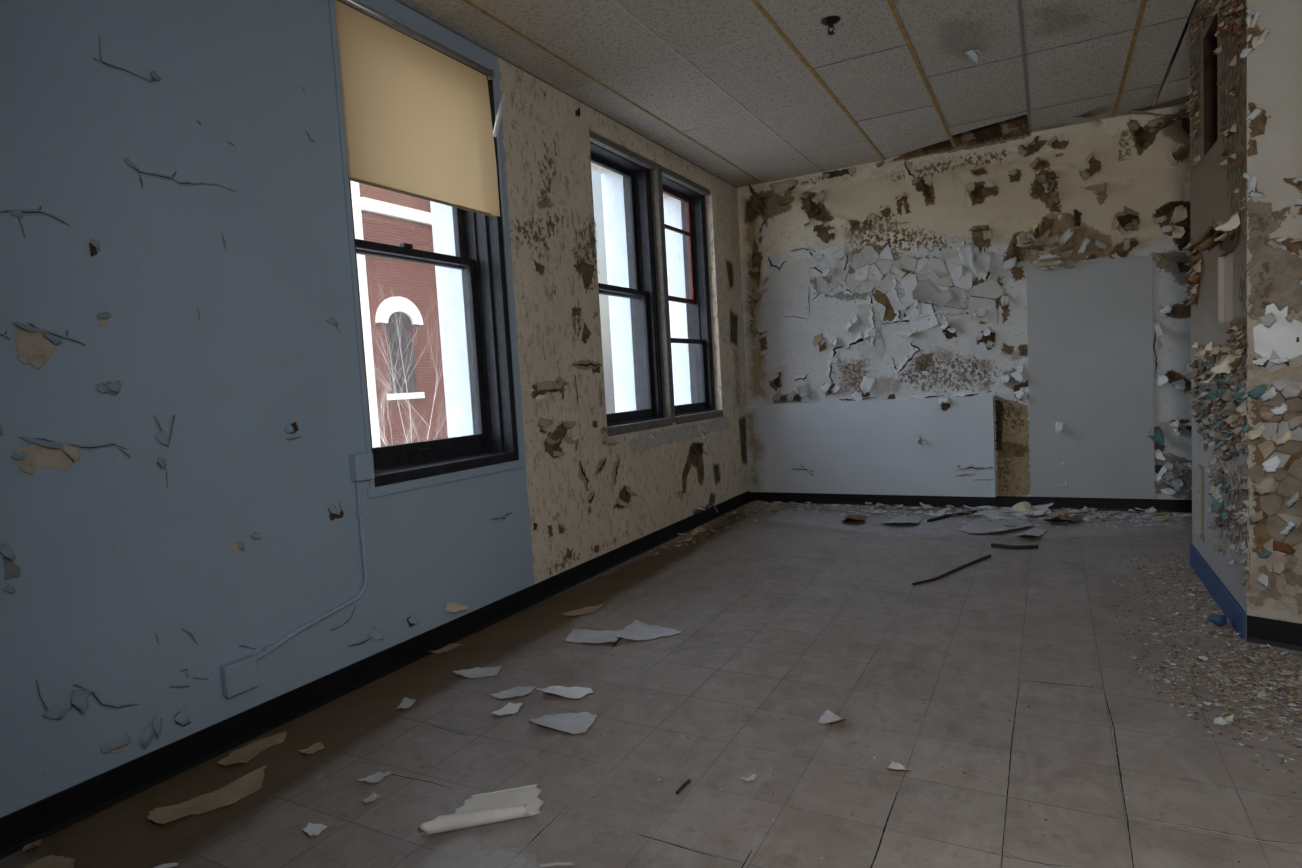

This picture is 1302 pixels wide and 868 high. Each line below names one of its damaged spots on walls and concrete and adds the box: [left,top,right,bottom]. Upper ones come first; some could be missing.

crack [92,35,162,84]
crack [123,157,238,193]
crack [0,206,70,238]
spalling [509,139,600,344]
spalling [731,0,1302,615]
peeling [12,322,86,370]
peeling [530,378,576,459]
peeling [11,436,132,475]
spalling [677,441,708,499]
crack [35,679,139,721]